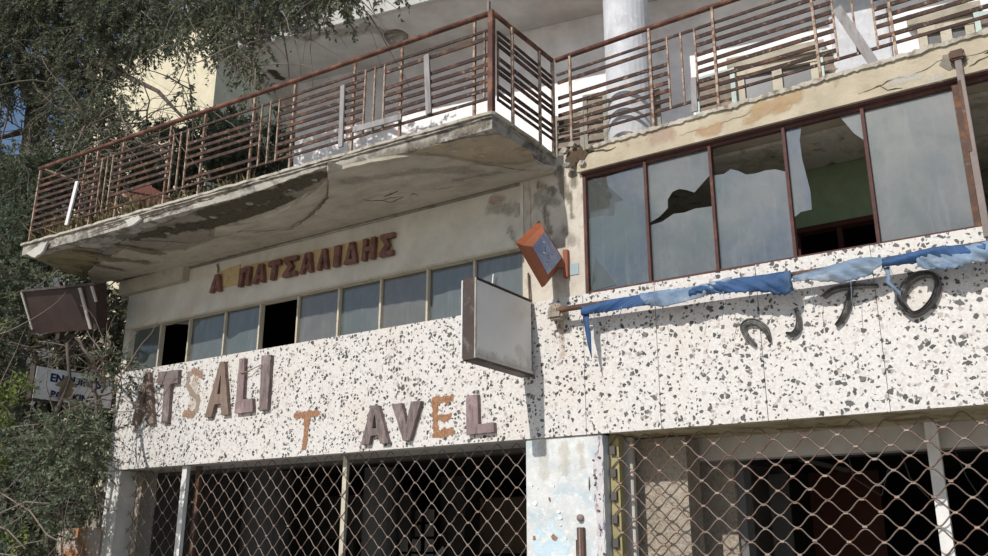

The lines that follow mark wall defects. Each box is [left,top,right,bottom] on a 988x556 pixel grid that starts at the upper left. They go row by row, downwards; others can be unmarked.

crack [859,60,940,94]
spalling [27,166,329,277]
damp [535,166,576,235]
peeling [592,436,606,556]
peeling [532,510,574,556]